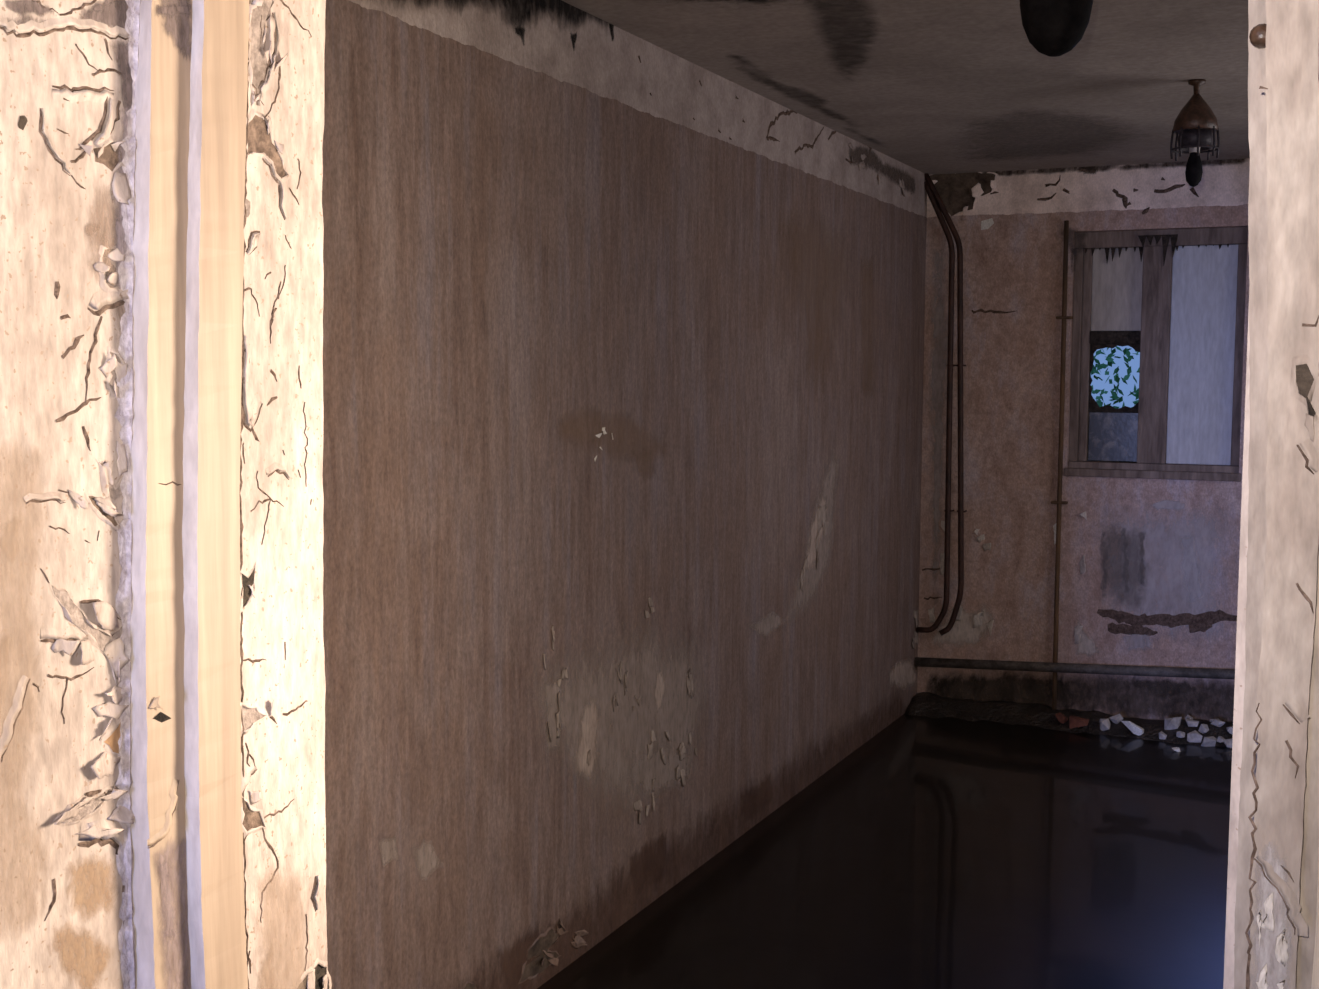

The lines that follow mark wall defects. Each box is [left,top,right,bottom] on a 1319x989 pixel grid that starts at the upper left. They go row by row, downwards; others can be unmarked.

spalling [246,0,289,184]
spalling [79,136,131,205]
peeling [93,242,128,295]
peeling [100,346,128,399]
peeling [68,441,128,532]
spalling [240,561,257,614]
leakage [1103,501,1220,632]
peeling [49,583,135,838]
spalling [241,790,267,837]
crack [1245,697,1310,989]
peeling [1255,844,1290,989]
spalling [295,958,332,989]